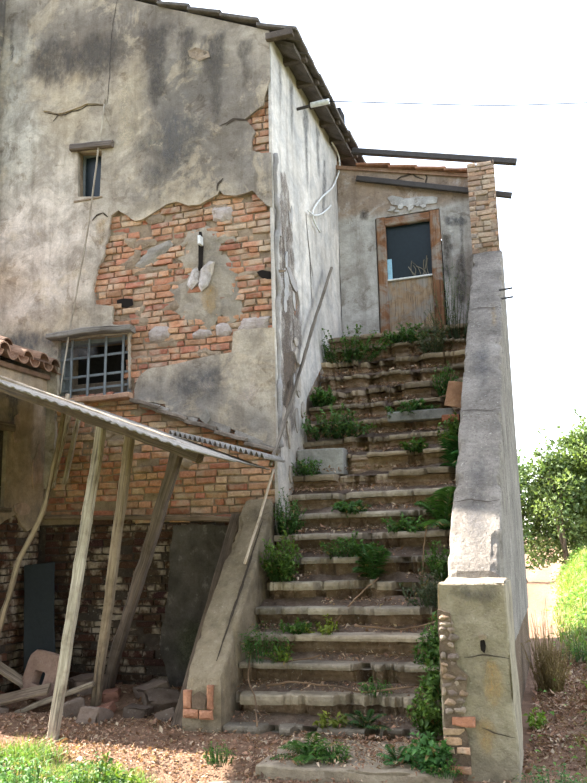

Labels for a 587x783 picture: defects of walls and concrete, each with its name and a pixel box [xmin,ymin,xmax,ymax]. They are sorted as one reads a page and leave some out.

crack [43,3,117,121]
damp [146,27,167,97]
damp [205,33,223,85]
spalling [226,94,269,153]
peeling [388,196,437,212]
flaking render [46,411,96,515]
flaking render [62,174,311,685]
flaking render [45,527,80,654]
flaking render [437,609,476,781]